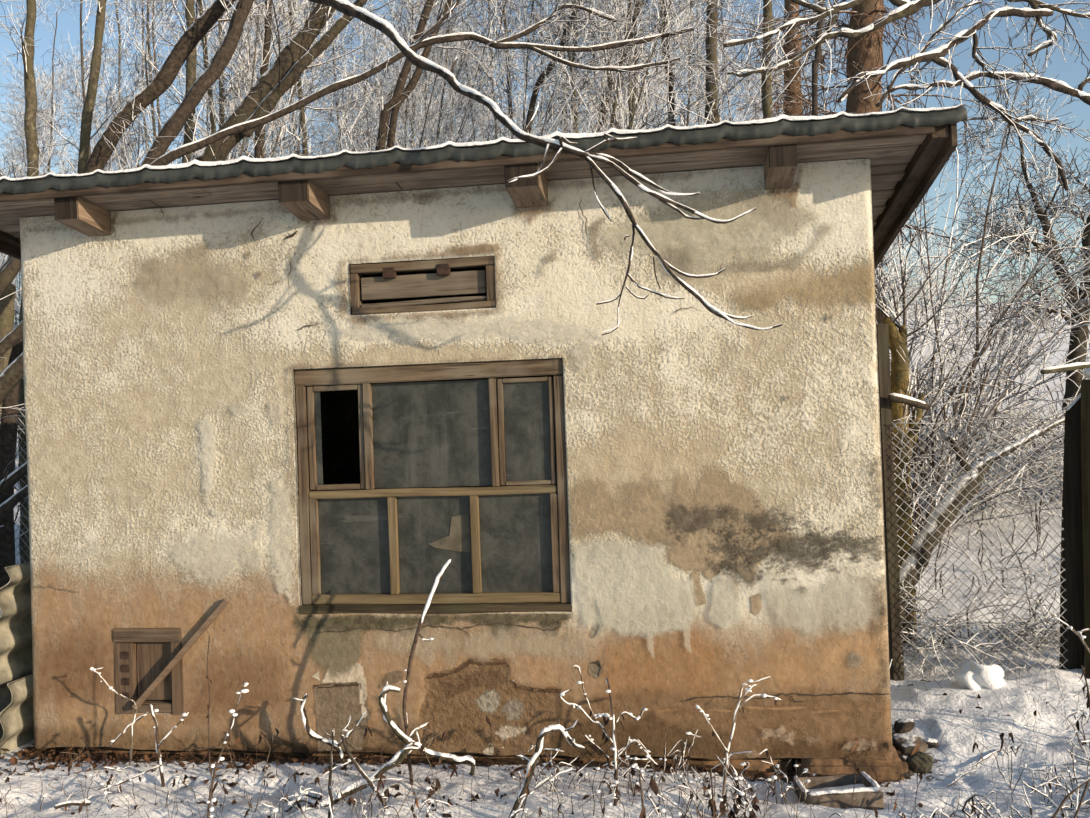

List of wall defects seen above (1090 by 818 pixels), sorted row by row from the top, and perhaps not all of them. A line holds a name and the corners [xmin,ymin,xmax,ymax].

leakage [666,505,884,582]
peeling [312,662,403,718]
spalling [419,658,561,755]